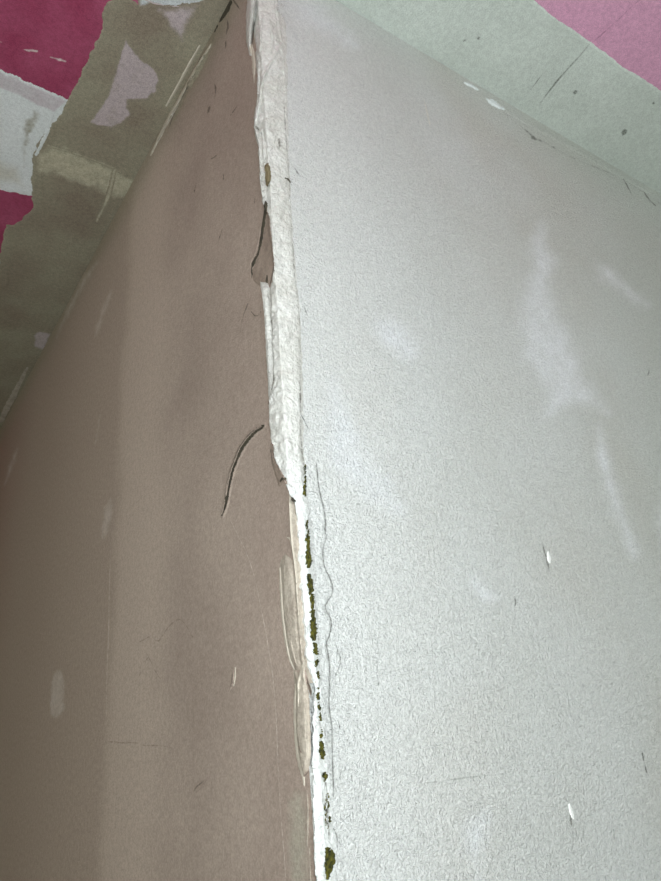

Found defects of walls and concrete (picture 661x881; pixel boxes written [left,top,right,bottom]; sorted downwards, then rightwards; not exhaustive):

crack [219,422,267,519]